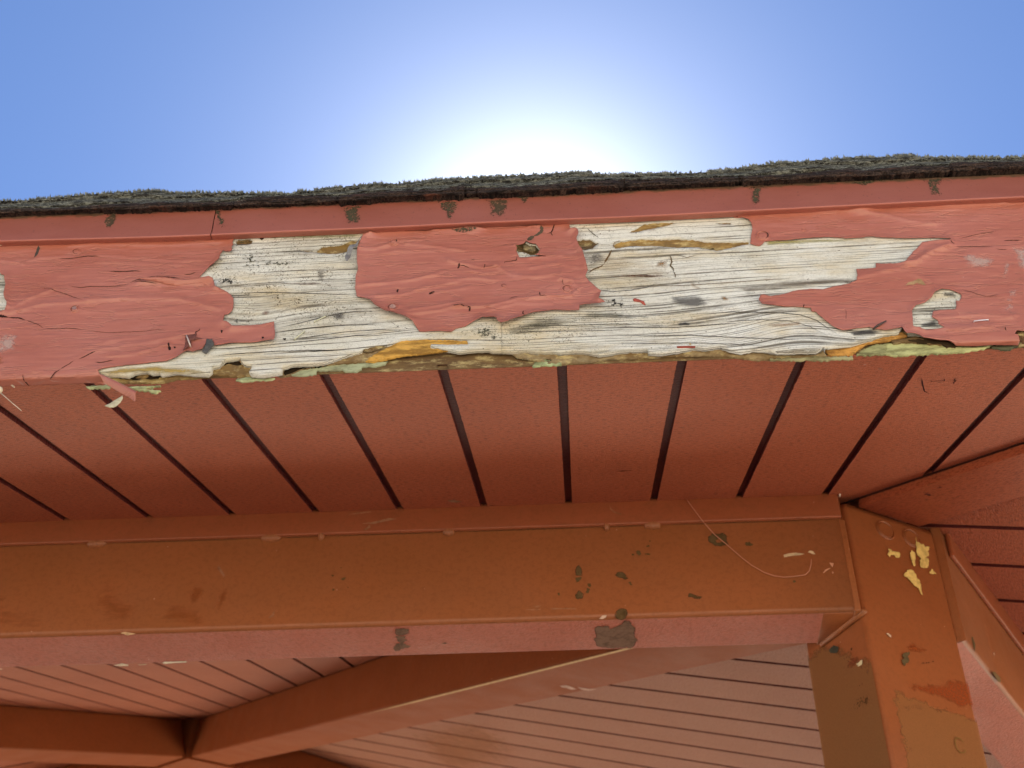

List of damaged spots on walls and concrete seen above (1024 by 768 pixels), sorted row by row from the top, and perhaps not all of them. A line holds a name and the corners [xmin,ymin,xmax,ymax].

crack [34,246,196,300]
peeling [0,202,1024,395]
crack [0,315,200,386]
peeling [888,541,936,594]
peeling [393,628,410,651]
peeling [594,608,638,649]